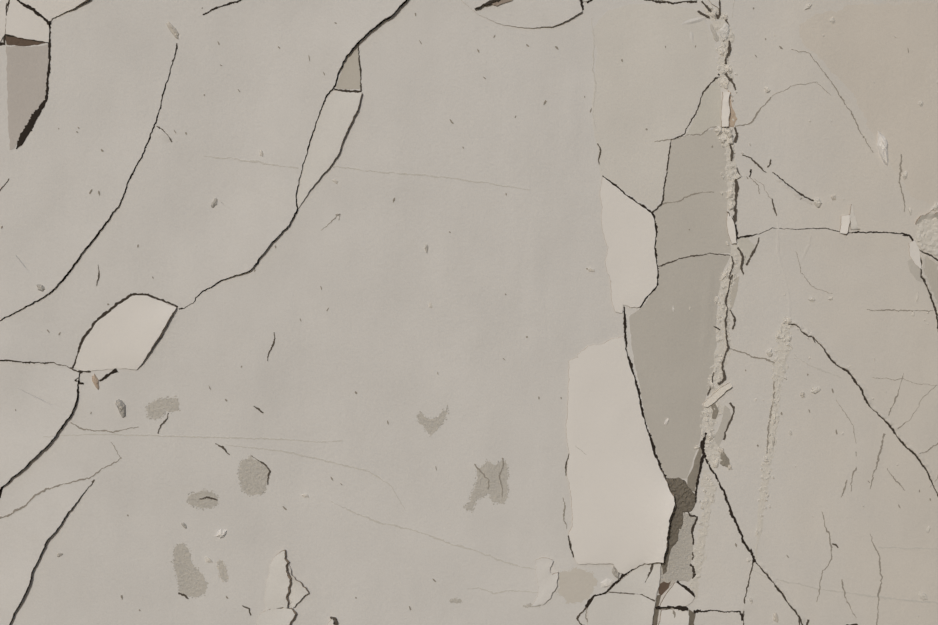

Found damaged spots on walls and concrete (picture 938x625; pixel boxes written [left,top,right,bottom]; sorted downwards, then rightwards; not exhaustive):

flaking render [0,0,89,150]
peeling [297,44,362,208]
crack [475,0,499,9]
peeling [462,0,589,28]
crack [0,0,407,625]
peeling [561,0,755,625]
crack [576,0,938,625]
crack [474,458,504,496]
crack [563,498,574,557]